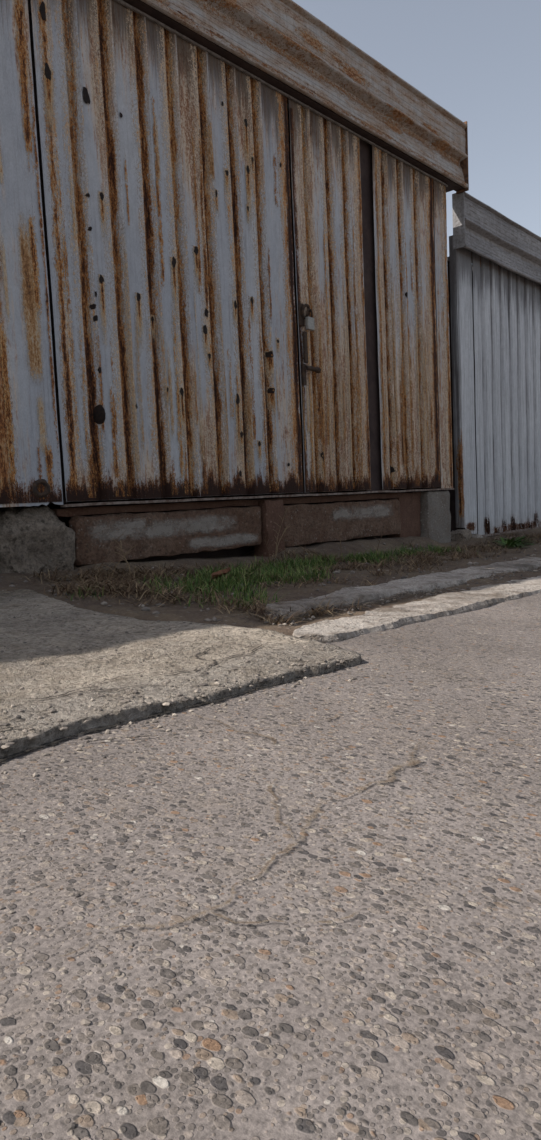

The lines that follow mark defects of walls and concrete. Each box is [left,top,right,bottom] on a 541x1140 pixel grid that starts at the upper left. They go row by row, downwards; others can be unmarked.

corrosion [0,0,541,536]
crack [0,643,421,956]